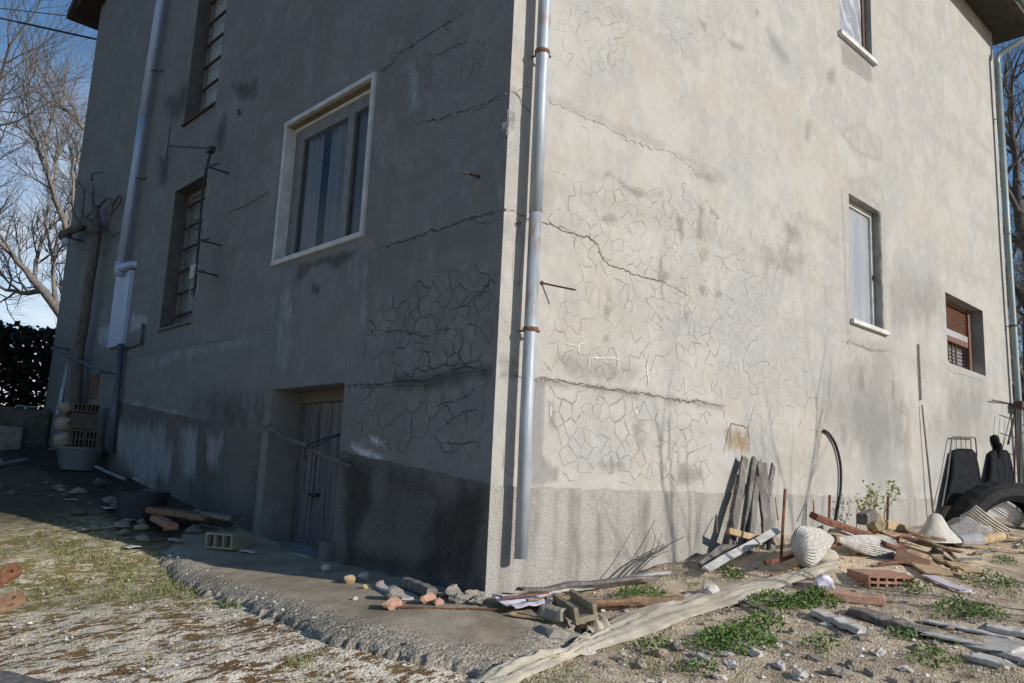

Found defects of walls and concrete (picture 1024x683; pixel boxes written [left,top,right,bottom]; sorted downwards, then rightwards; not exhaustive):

crack [347,6,826,486]